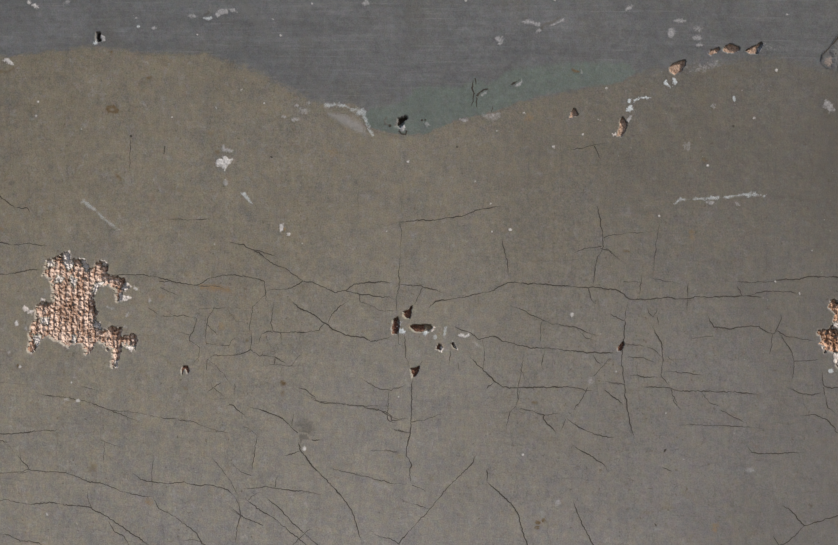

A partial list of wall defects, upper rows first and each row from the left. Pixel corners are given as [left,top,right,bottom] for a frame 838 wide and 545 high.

peeling [708,42,766,55]
peeling [662,61,685,89]
peeling [610,93,652,138]
spalling [20,249,138,370]
peeling [392,307,412,336]
spalling [817,300,838,367]
crack [0,203,838,545]